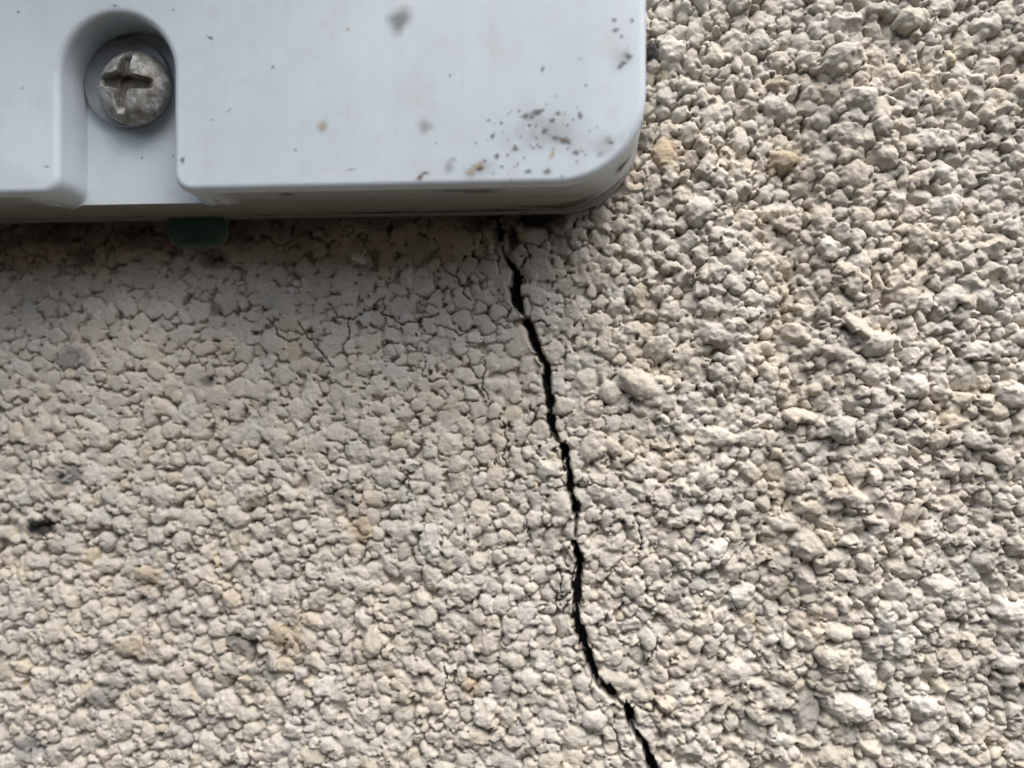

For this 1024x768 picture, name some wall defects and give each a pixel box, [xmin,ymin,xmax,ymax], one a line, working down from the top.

crack [499,218,658,768]